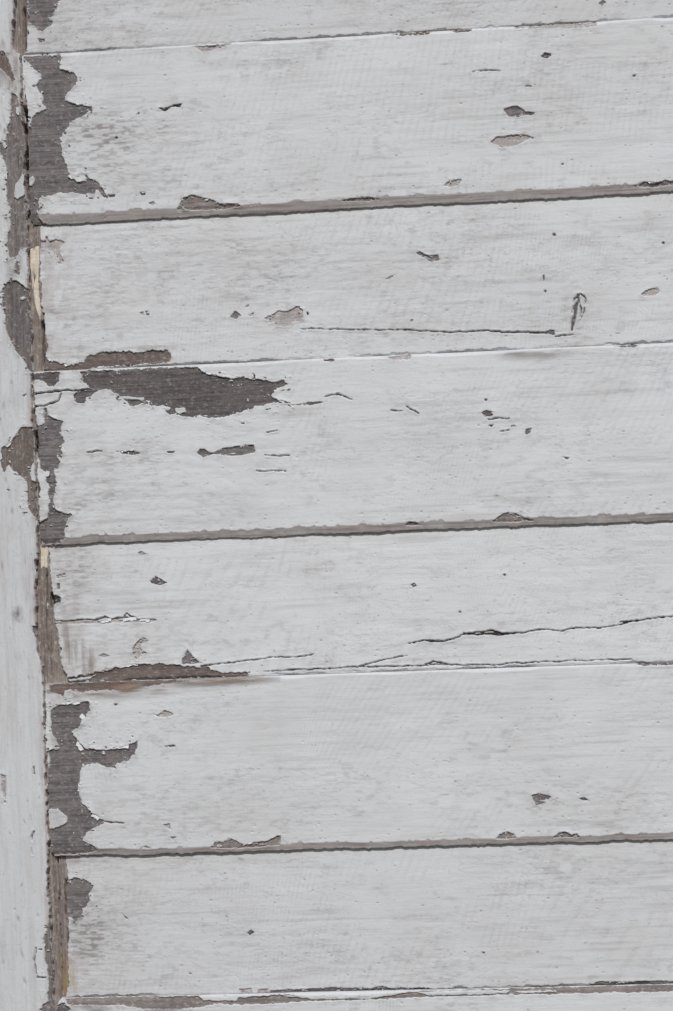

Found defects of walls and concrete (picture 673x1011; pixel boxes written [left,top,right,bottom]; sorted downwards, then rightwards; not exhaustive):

peeling [27,0,61,42]
peeling [196,44,230,52]
peeling [491,135,533,148]
peeling [0,52,323,424]
crack [304,295,586,337]
peeling [0,406,72,545]
peeling [198,445,255,458]
crack [201,616,672,672]
peeling [47,638,250,855]
peeling [66,872,97,924]